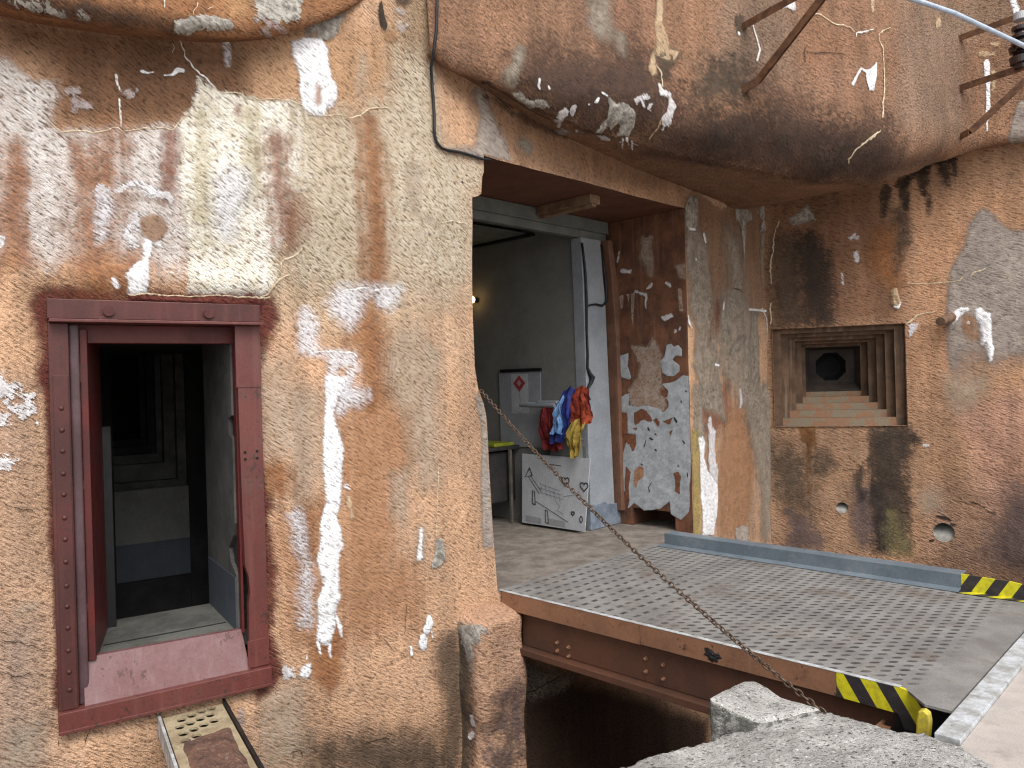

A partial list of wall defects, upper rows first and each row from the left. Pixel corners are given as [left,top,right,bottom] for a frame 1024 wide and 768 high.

peeling [0,453,20,471]
peeling [0,371,38,426]
corrosion [284,115,418,693]
damp [0,0,959,329]
peeling [619,235,654,323]
peeling [620,262,691,520]
damp [686,206,838,550]
damp [851,426,933,556]